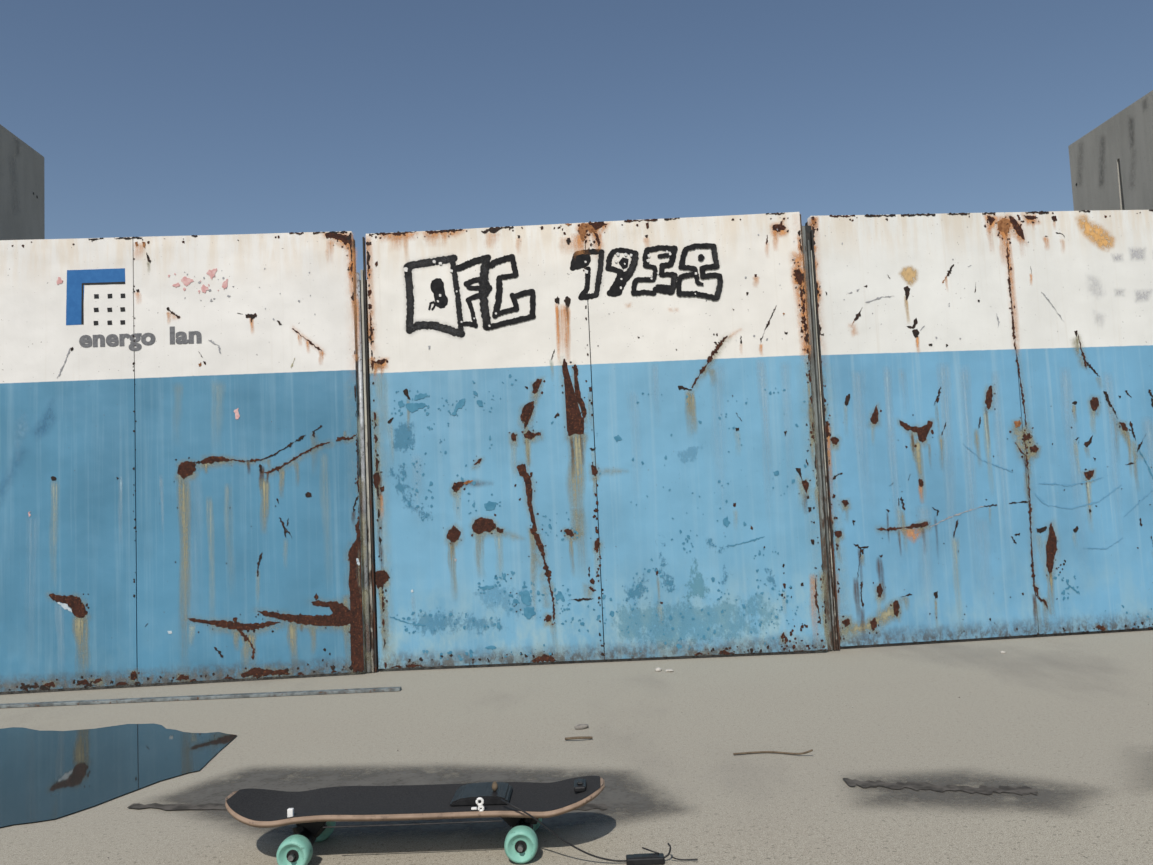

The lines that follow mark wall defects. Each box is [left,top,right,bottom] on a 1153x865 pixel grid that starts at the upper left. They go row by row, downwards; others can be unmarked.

corrosion [540,221,607,249]
peeling [168,268,234,302]
corrosion [275,229,467,384]
corrosion [766,212,843,523]
corrosion [904,286,925,347]
corrosion [949,211,1057,480]
corrosion [520,379,545,459]
corrosion [899,420,934,491]
corrosion [3,399,390,691]
corrosion [443,514,503,570]
corrosion [561,359,605,656]
corrosion [1046,523,1066,592]